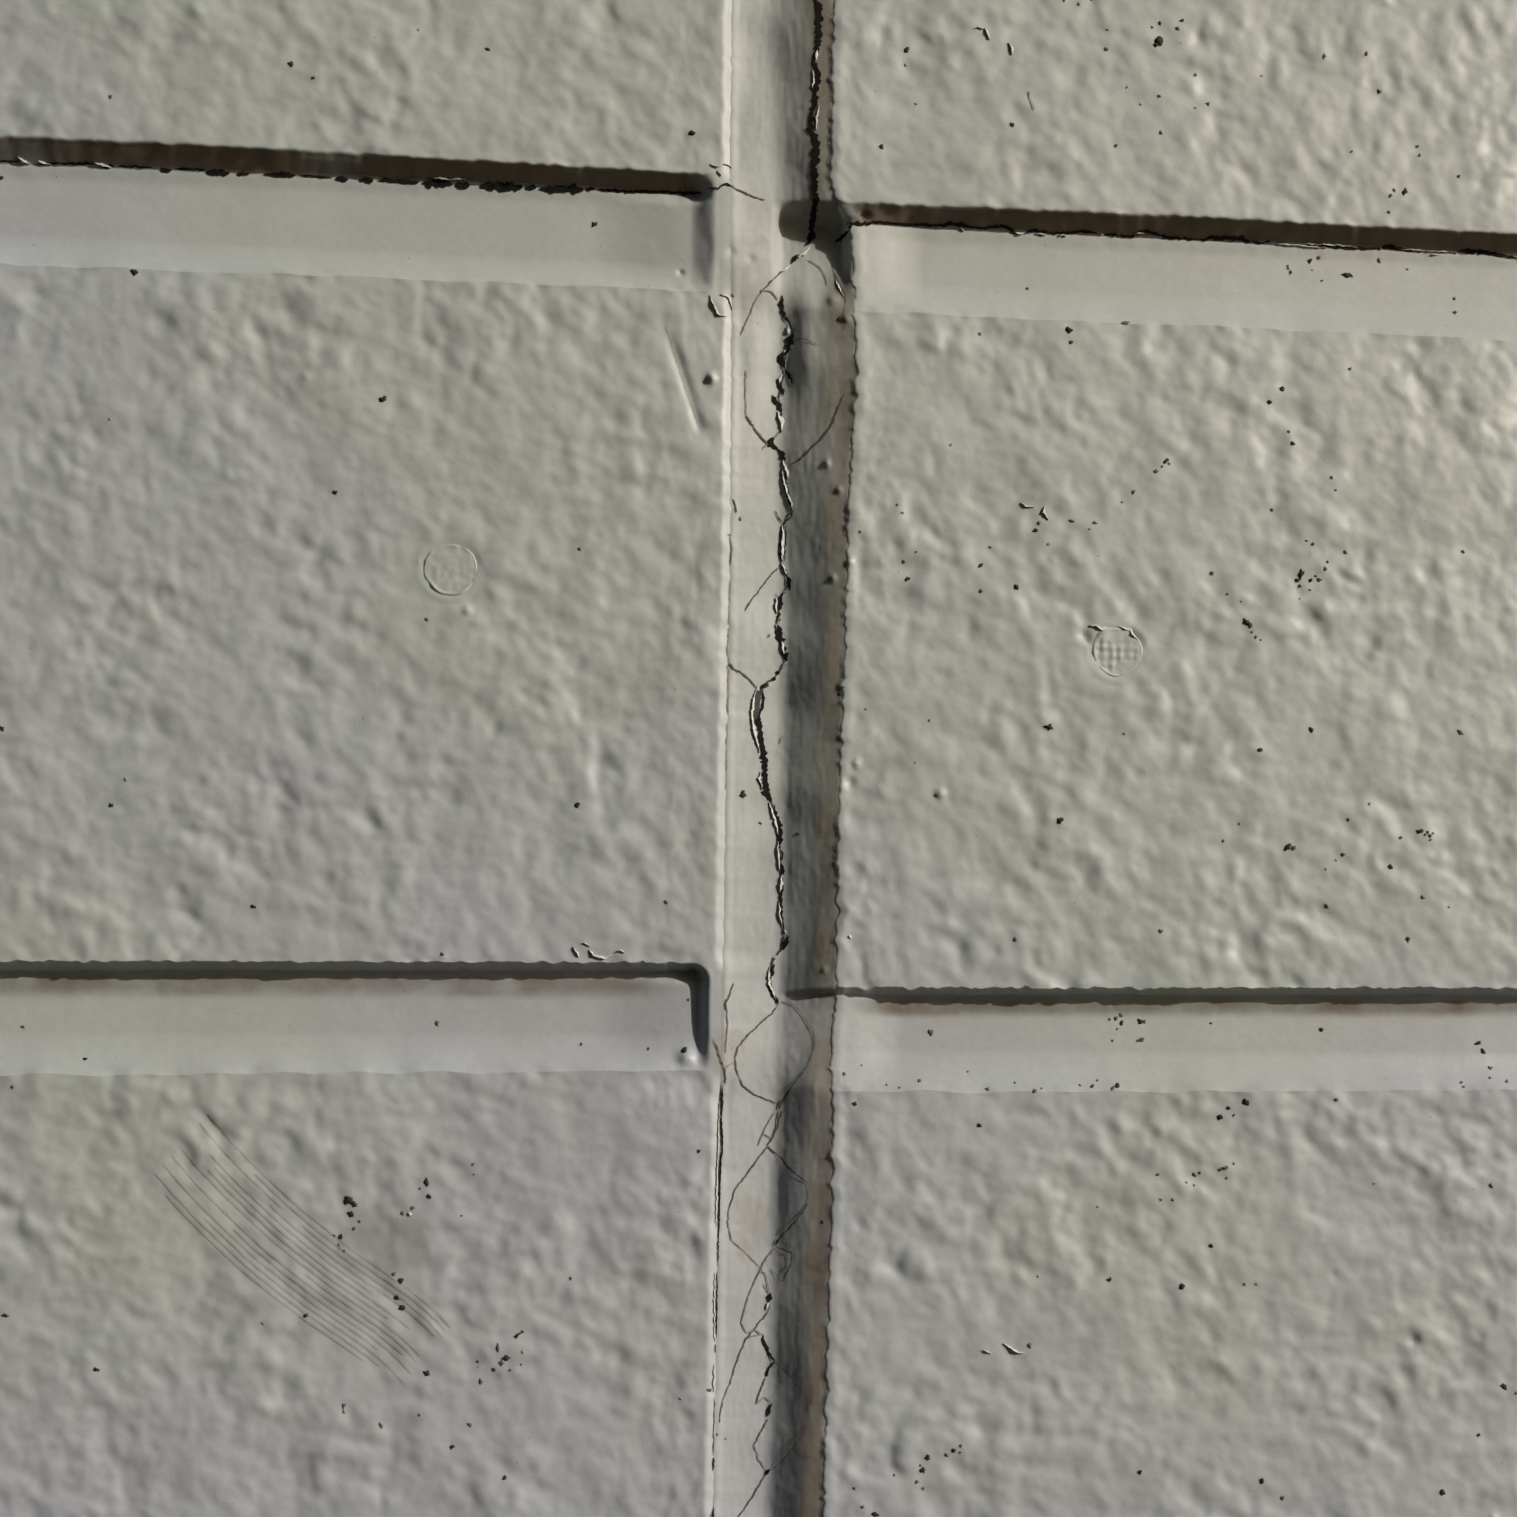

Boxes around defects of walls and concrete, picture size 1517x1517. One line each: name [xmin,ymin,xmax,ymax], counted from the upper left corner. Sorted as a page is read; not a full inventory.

crack [712,0,1517,1517]